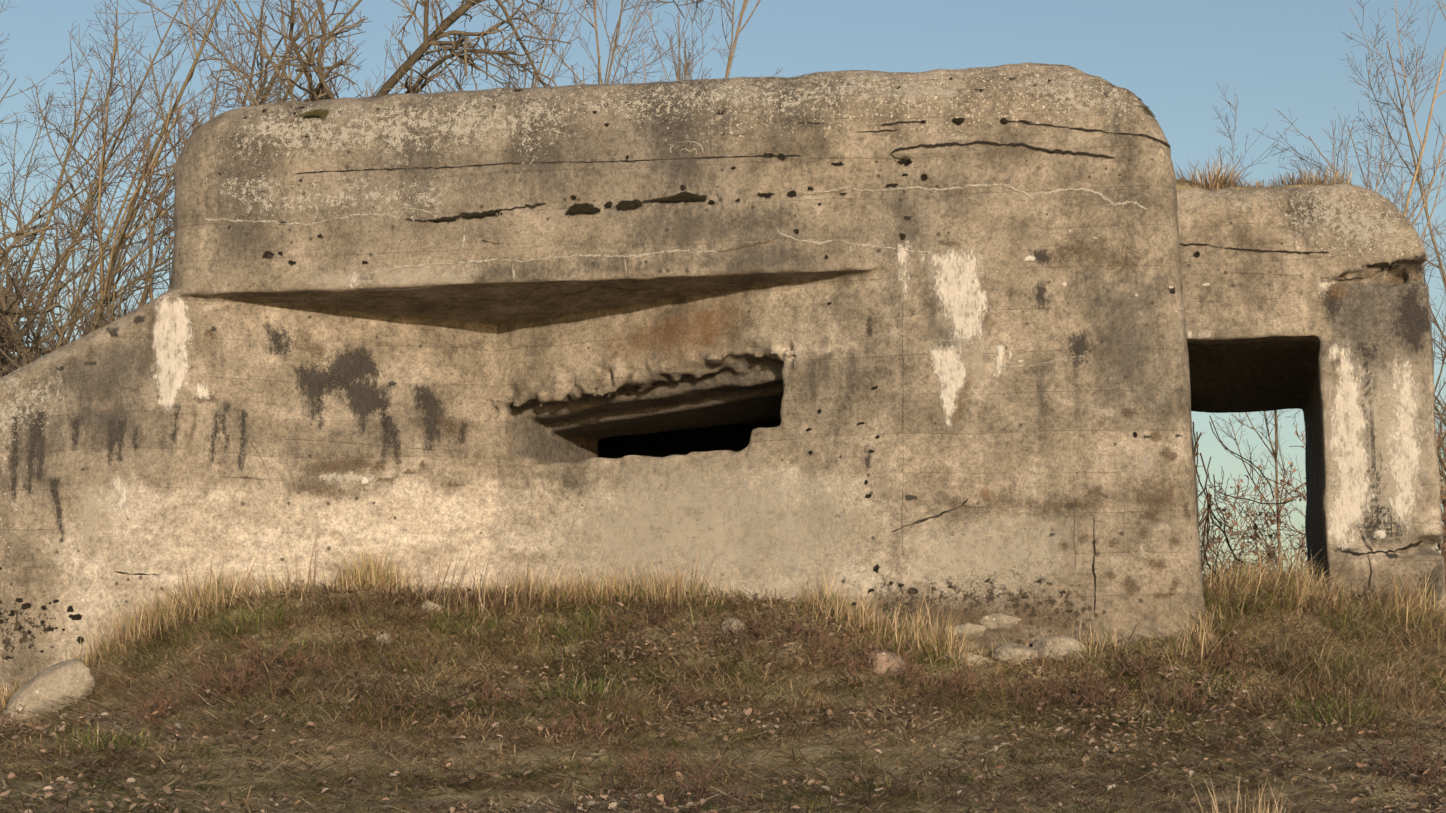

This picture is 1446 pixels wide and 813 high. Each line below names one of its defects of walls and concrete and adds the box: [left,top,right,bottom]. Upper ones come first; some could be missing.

crack [205,120,1170,286]
leakage [897,216,993,426]
crack [1180,243,1329,254]
spalling [1318,255,1425,294]
leakage [9,406,65,542]
leakage [70,419,79,449]
leakage [107,420,138,515]
leakage [134,295,249,471]
leakage [263,323,402,463]
leakage [414,384,467,453]
crack [1335,522,1424,591]